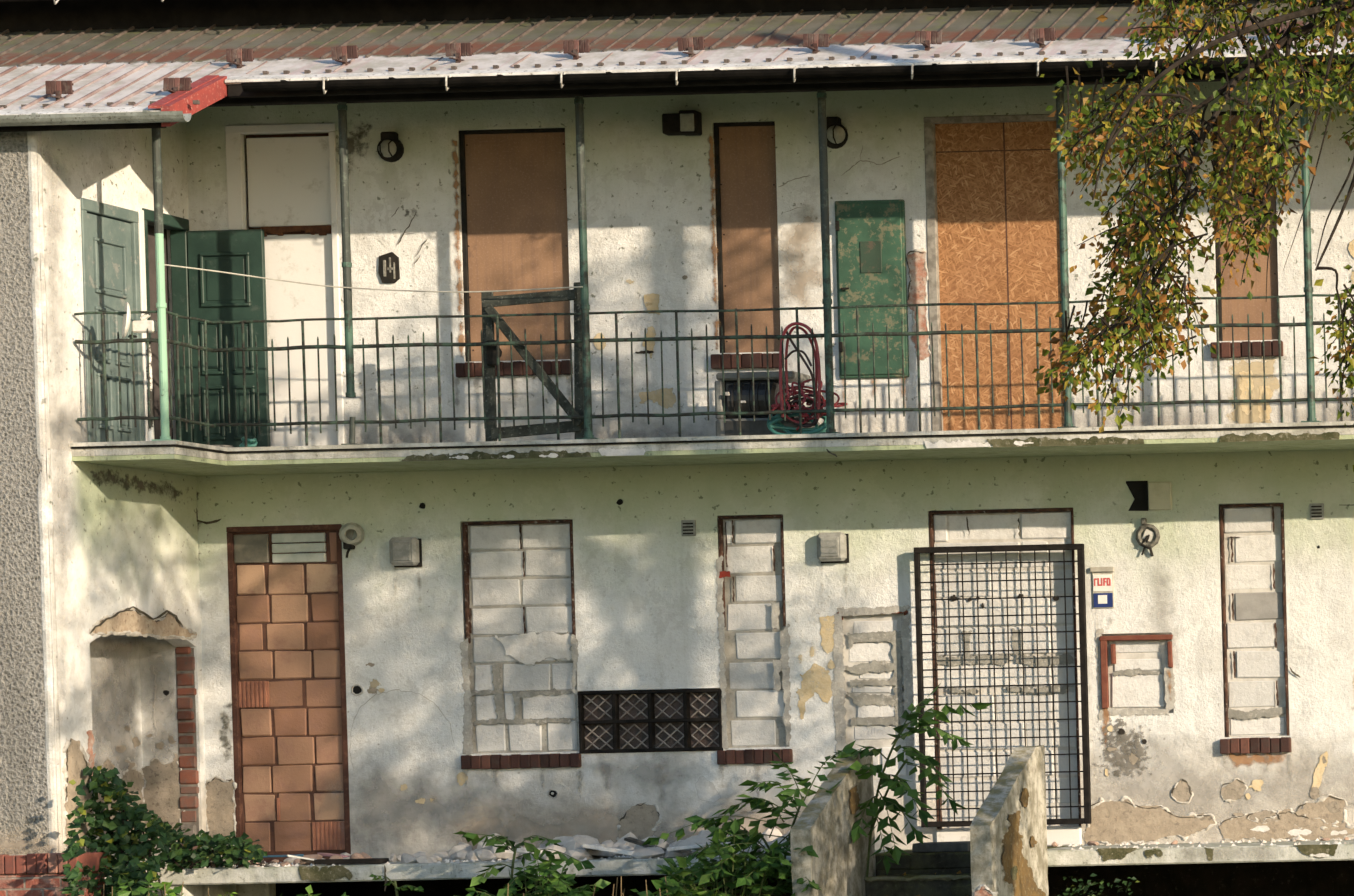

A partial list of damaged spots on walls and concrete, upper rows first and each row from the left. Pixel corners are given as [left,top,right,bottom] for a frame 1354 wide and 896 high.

spalling [906,248,931,361]
water stain [91,469,199,499]
spalling [89,607,197,640]
peeling [796,615,835,719]
peeling [61,725,184,850]
spalling [205,776,237,838]
spalling [616,802,662,841]
peeling [974,788,1047,896]
spalling [1082,751,1354,858]